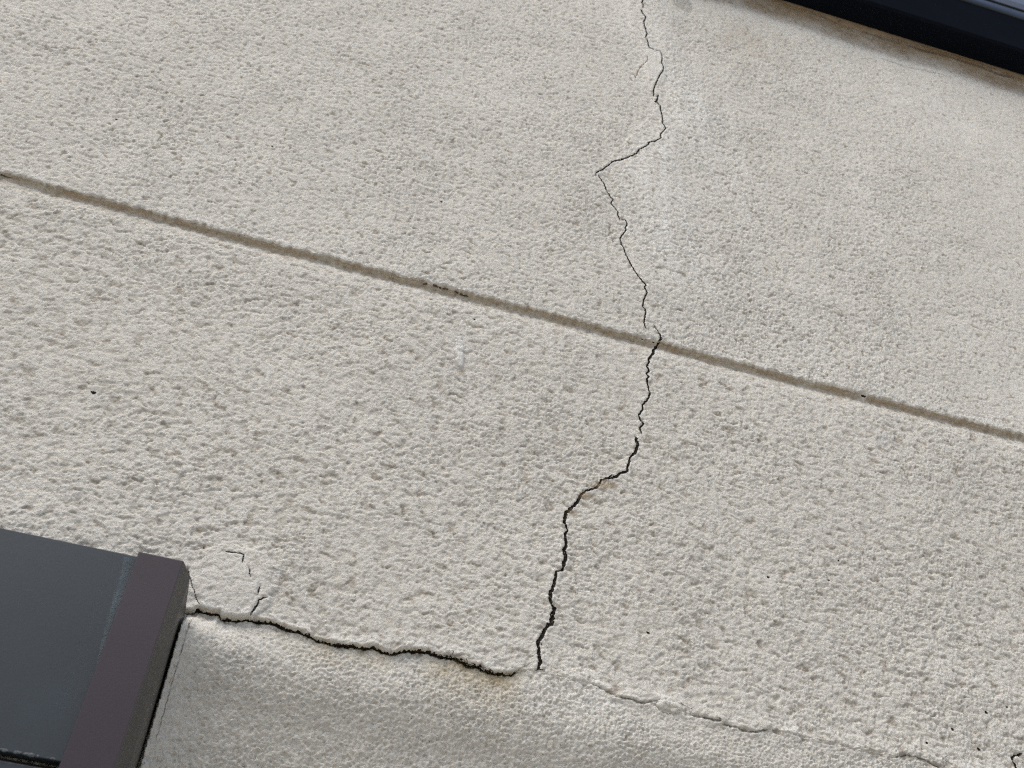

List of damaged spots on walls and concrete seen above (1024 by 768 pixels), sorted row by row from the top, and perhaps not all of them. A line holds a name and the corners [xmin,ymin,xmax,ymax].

crack [144,0,666,752]